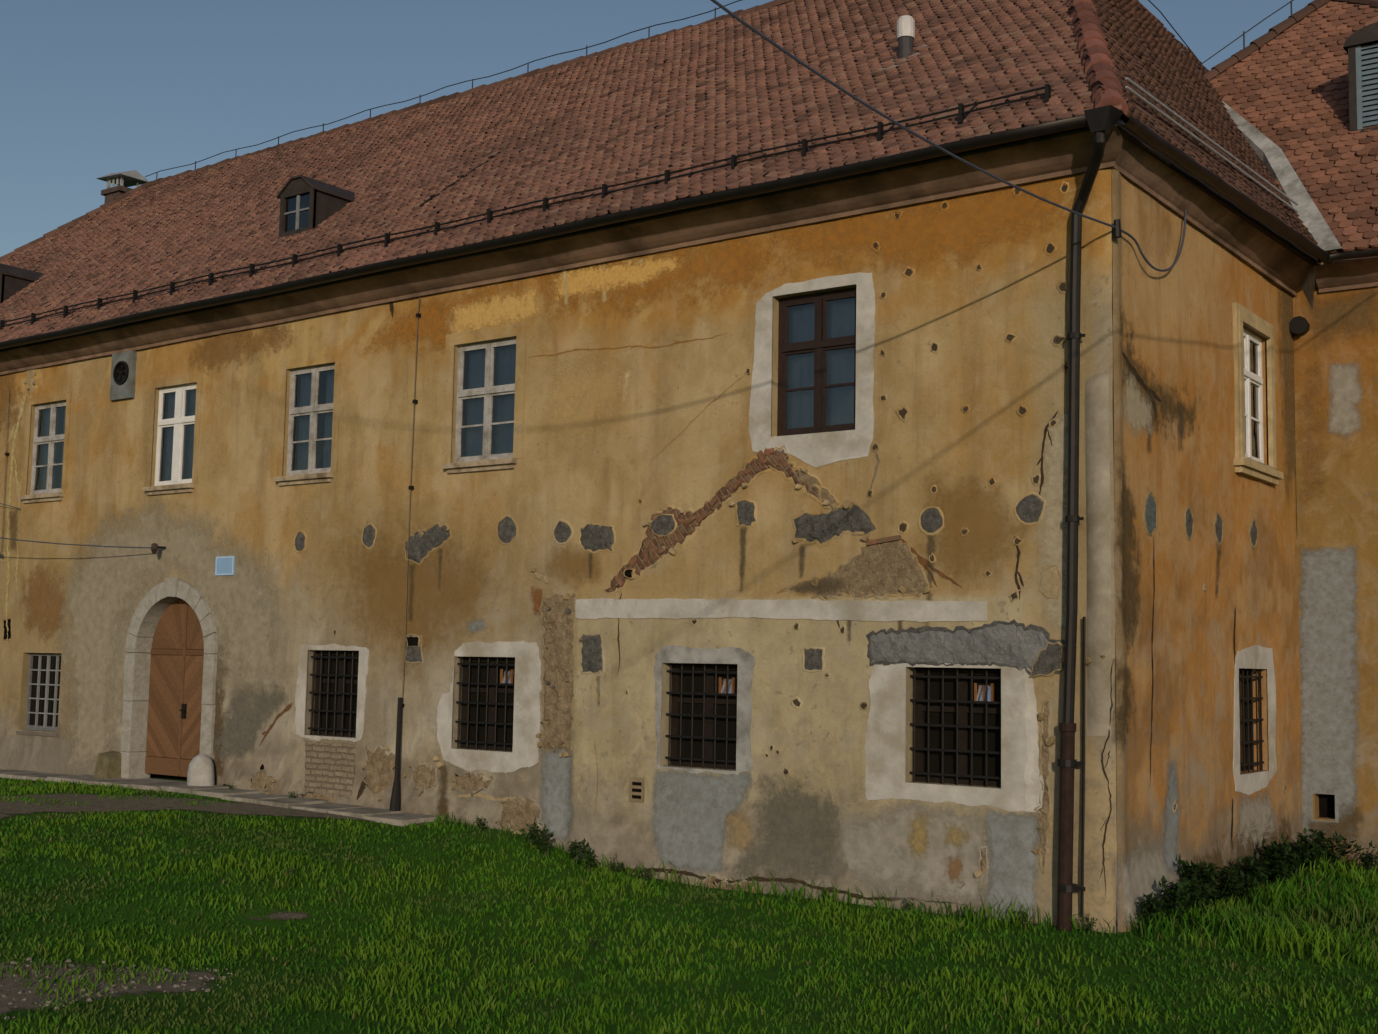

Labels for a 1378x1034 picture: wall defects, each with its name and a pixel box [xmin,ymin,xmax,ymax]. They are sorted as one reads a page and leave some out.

crack [528,333,726,358]
water stain [1121,316,1195,449]
spalling [552,445,969,601]
water stain [213,645,284,781]
flaking render [536,590,605,758]
water stain [725,784,840,879]
crack [1100,663,1113,898]